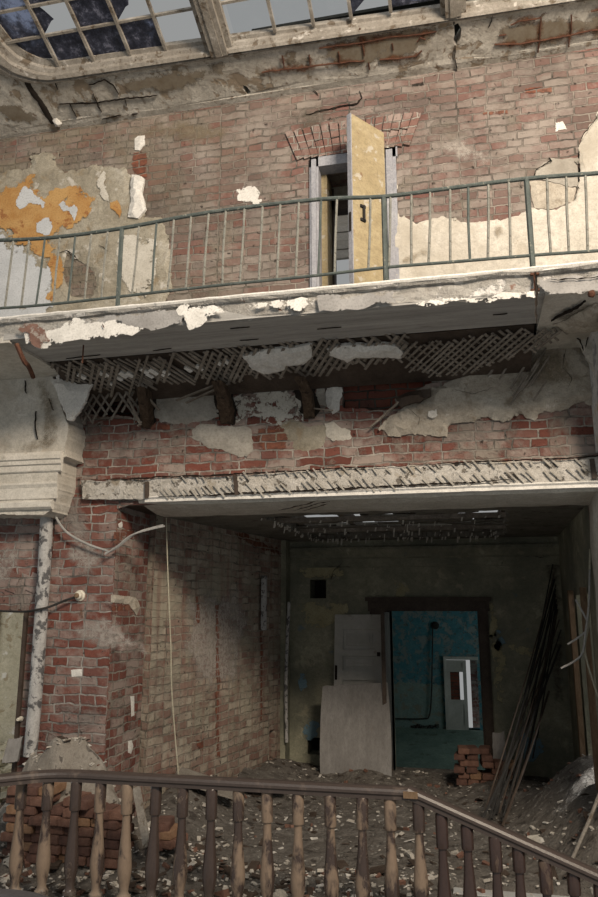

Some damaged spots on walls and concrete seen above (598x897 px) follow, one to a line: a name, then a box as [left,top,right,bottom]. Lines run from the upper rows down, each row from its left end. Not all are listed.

crack [14,79,157,124]
crack [306,91,362,115]
spalling [131,152,147,177]
crack [535,272,598,324]
spalling [83,310,184,330]
spalling [255,425,288,452]